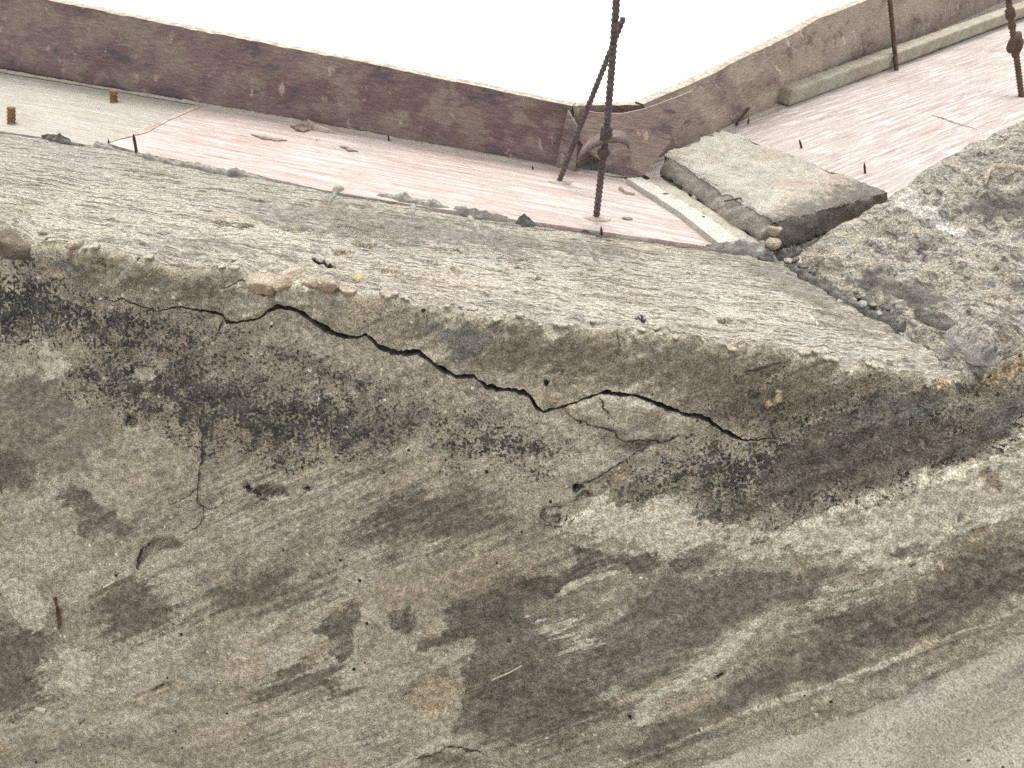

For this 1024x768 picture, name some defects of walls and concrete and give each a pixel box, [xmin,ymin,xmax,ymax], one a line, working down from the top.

leakage [0,257,608,490]
crack [81,278,804,484]
leakage [859,269,940,308]
leakage [0,434,134,537]